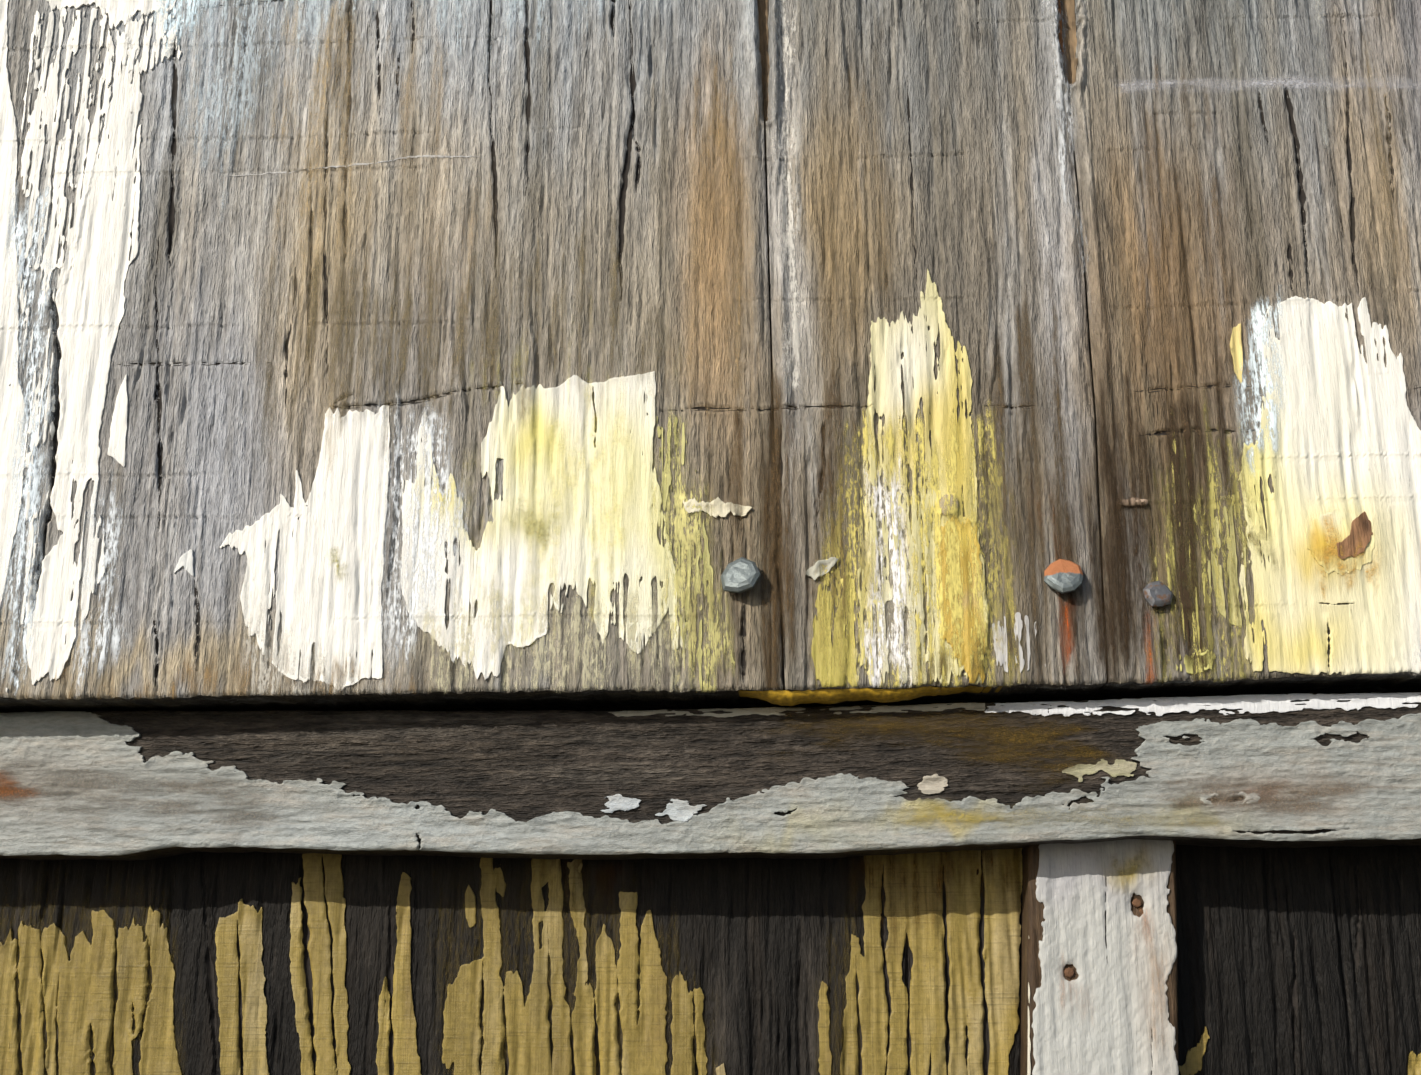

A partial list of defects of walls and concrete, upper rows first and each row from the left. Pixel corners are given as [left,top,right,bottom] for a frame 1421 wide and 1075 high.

peeling [0,0,182,685]
crack [610,0,641,300]
peeling [0,268,1421,1075]